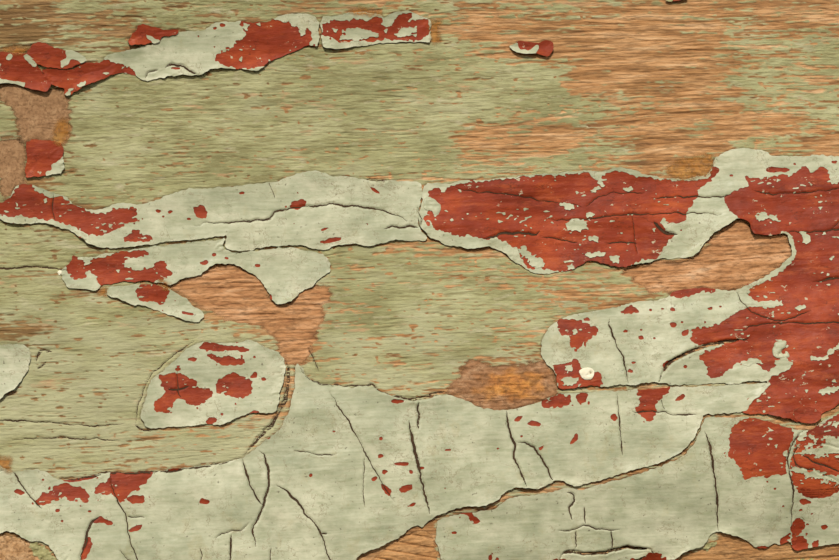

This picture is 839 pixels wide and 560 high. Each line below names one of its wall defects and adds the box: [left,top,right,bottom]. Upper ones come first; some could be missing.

spalling [320,11,431,49]
peeling [509,40,554,57]
spalling [0,13,320,236]
crack [64,350,447,560]
peeling [0,148,839,560]
crack [506,415,655,560]
crack [608,319,695,455]
crack [705,433,719,527]
crack [660,295,839,379]
crack [787,431,839,527]